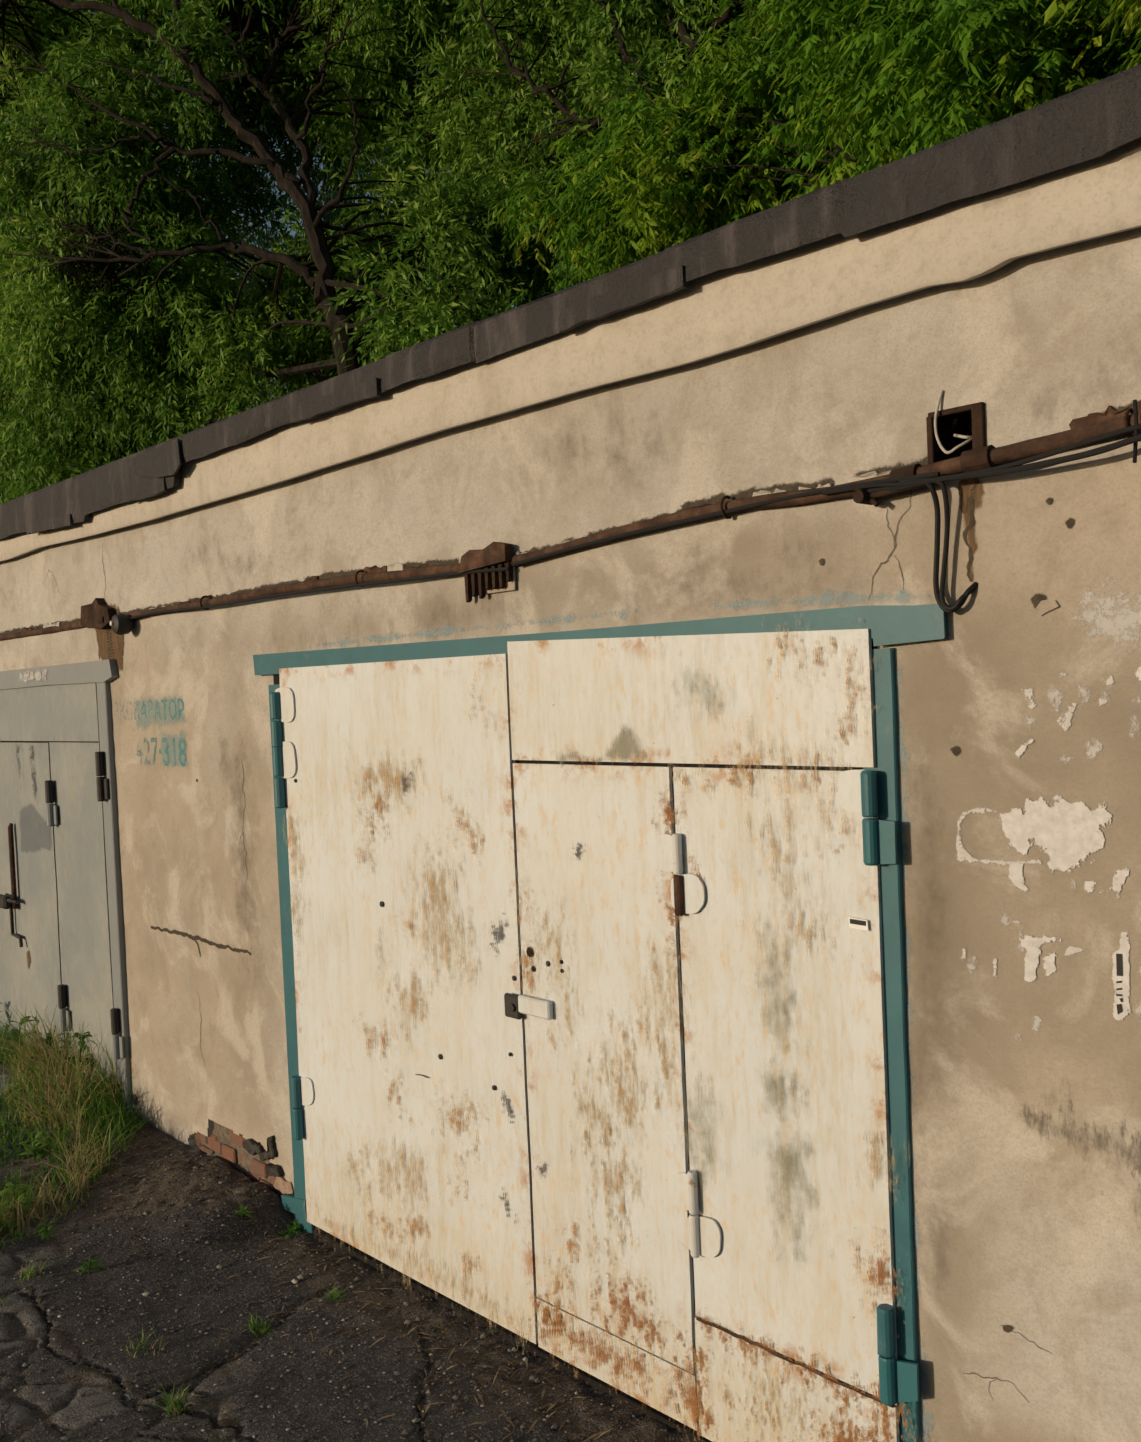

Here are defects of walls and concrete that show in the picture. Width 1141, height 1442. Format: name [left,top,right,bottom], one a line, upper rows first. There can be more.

crack [868,490,912,600]
rust [958,478,984,581]
rust [95,603,124,674]
flaking render [1031,593,1060,616]
rust [349,754,422,869]
rust [378,795,527,984]
rust [676,630,871,1034]
peeling [1008,861,1029,892]
crack [151,926,251,957]
peeling [1031,936,1061,976]
flaking render [193,1122,294,1201]
rust [316,856,915,1442]